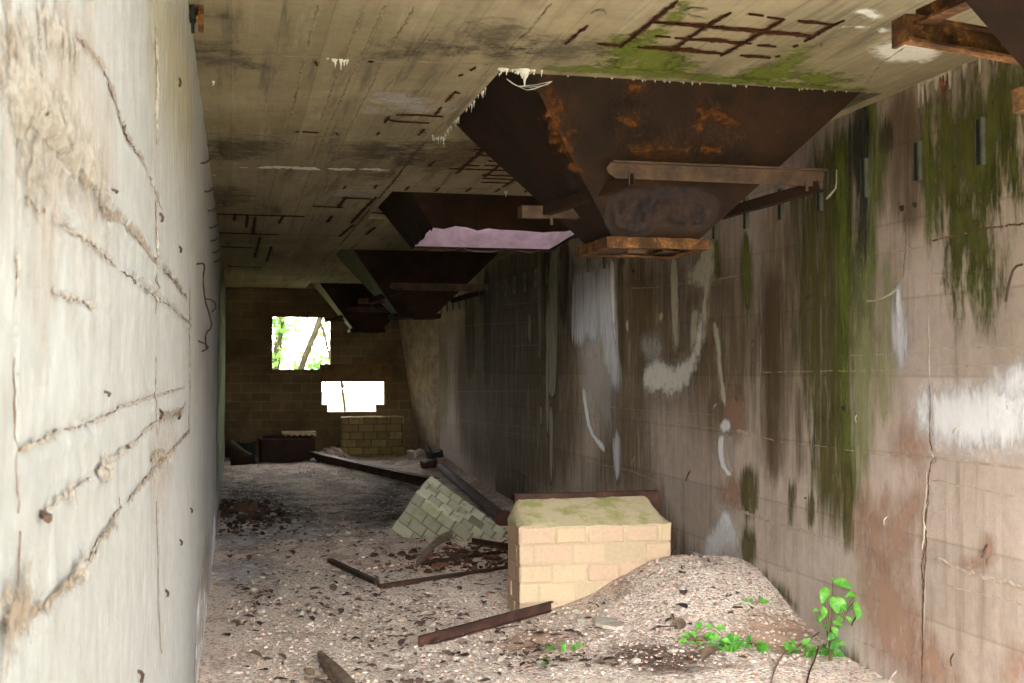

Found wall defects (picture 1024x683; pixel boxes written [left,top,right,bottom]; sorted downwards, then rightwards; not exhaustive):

leakage [848,106,870,254]
leakage [883,58,994,226]
leakage [439,243,752,500]
leakage [764,231,794,471]
leakage [892,286,907,366]
leakage [917,364,1024,452]
leakage [659,507,736,556]
crack [921,385,936,683]